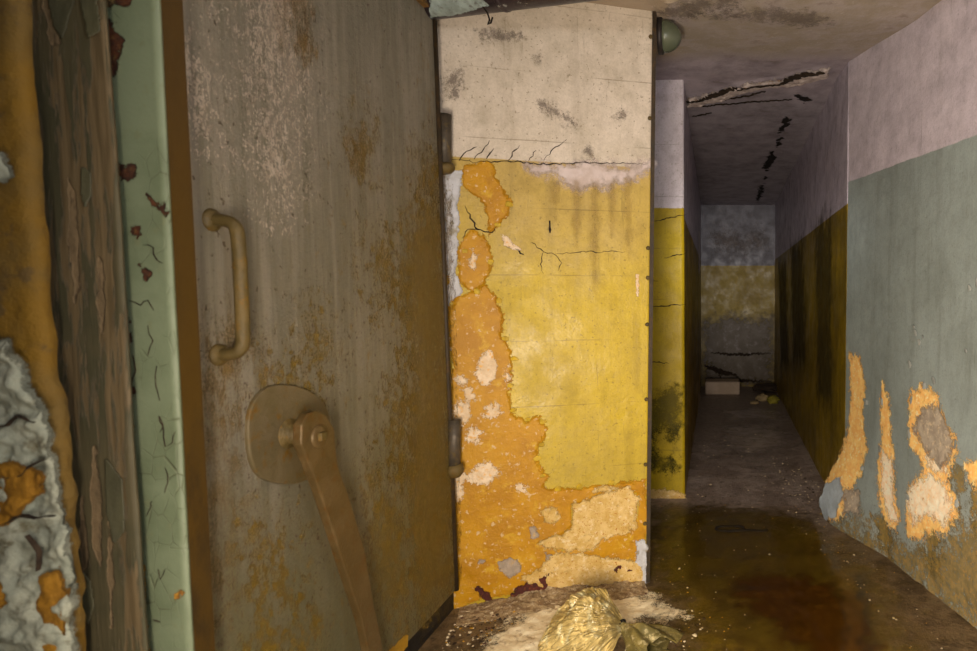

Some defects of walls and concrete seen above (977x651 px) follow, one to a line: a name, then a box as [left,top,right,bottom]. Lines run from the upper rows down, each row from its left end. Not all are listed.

corrosion [107,0,132,77]
flaking render [0,152,15,184]
corrosion [119,163,138,182]
corrosion [146,193,170,218]
crack [463,207,495,237]
crack [452,139,645,165]
crack [531,221,623,274]
peeling [443,161,686,609]
leakage [651,383,686,473]
peeling [819,352,977,543]
flaking render [0,338,125,651]
leakage [650,462,977,651]